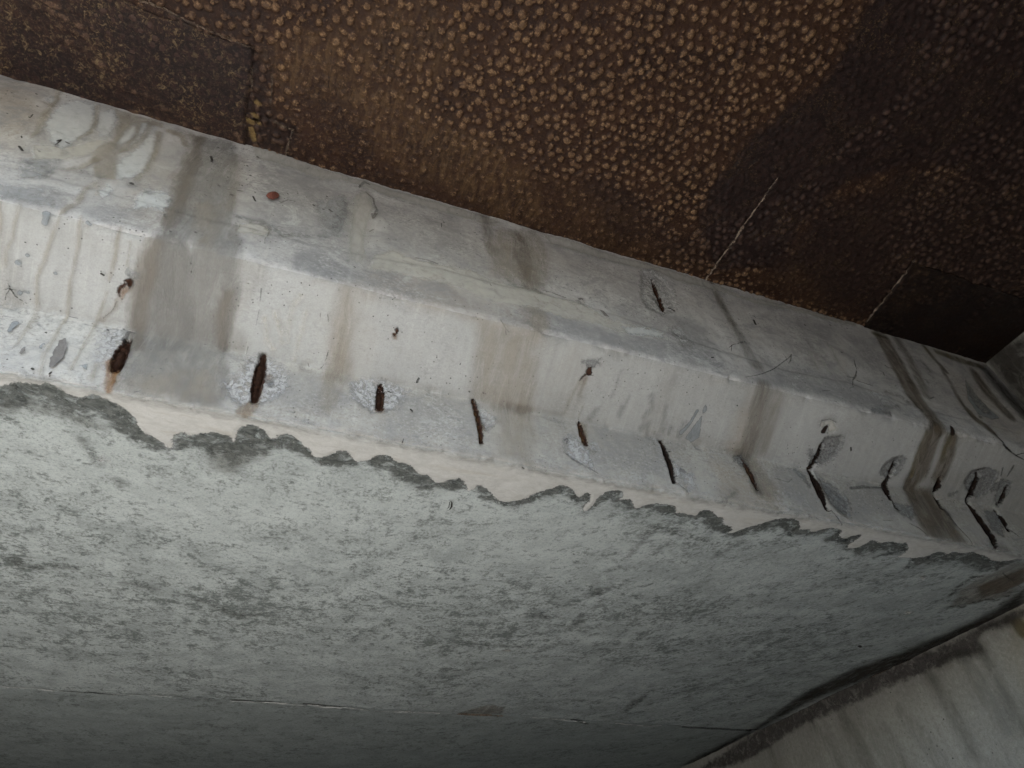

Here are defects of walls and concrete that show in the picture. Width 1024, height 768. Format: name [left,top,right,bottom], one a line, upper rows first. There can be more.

water stain [125,139,267,402]
corrosion [641,270,677,314]
corrosion [96,329,133,392]
corrosion [221,354,288,411]
corrosion [351,379,410,413]
corrosion [471,399,496,444]
peeling [0,374,1024,562]
corrosion [564,421,599,471]
corrosion [659,440,696,492]
corrosion [733,456,758,491]
corrosion [793,419,915,525]
corrosion [932,467,1018,549]